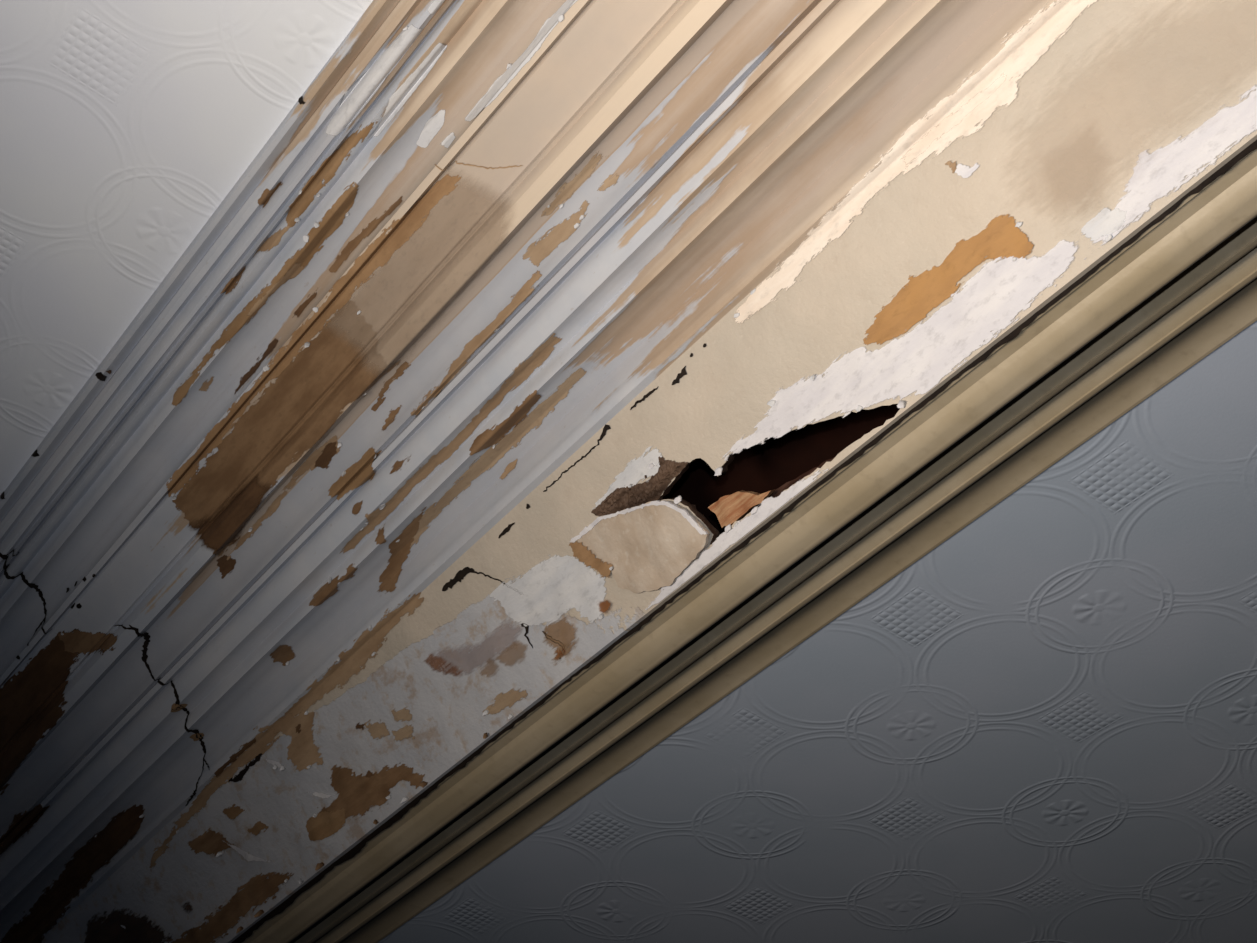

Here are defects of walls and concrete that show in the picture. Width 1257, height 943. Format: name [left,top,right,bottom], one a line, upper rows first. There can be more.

peeling [172,24,447,406]
peeling [416,110,455,148]
peeling [427,0,445,14]
peeling [465,0,578,121]
peeling [166,151,619,579]
peeling [488,85,1257,627]
crack [0,549,96,659]
peeling [0,629,117,795]
crack [115,624,209,806]
peeling [149,333,587,943]
crack [231,140,1257,943]
peeling [0,804,145,943]